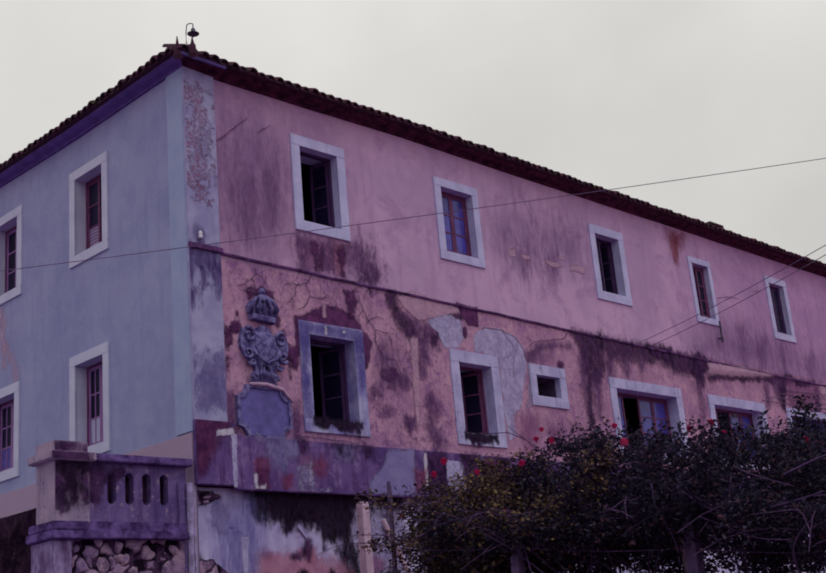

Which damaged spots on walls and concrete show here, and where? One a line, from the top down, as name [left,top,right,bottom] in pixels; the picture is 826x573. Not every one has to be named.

peeling [184,81,217,207]
damp [189,229,222,307]
corrosion [669,231,684,262]
damp [194,311,242,475]
crack [229,268,456,448]
damp [275,290,509,498]
peeling [398,291,533,440]
damp [526,327,709,425]
peeling [216,428,238,487]
peeling [254,433,314,489]
damp [244,491,403,573]
peeling [368,449,417,573]